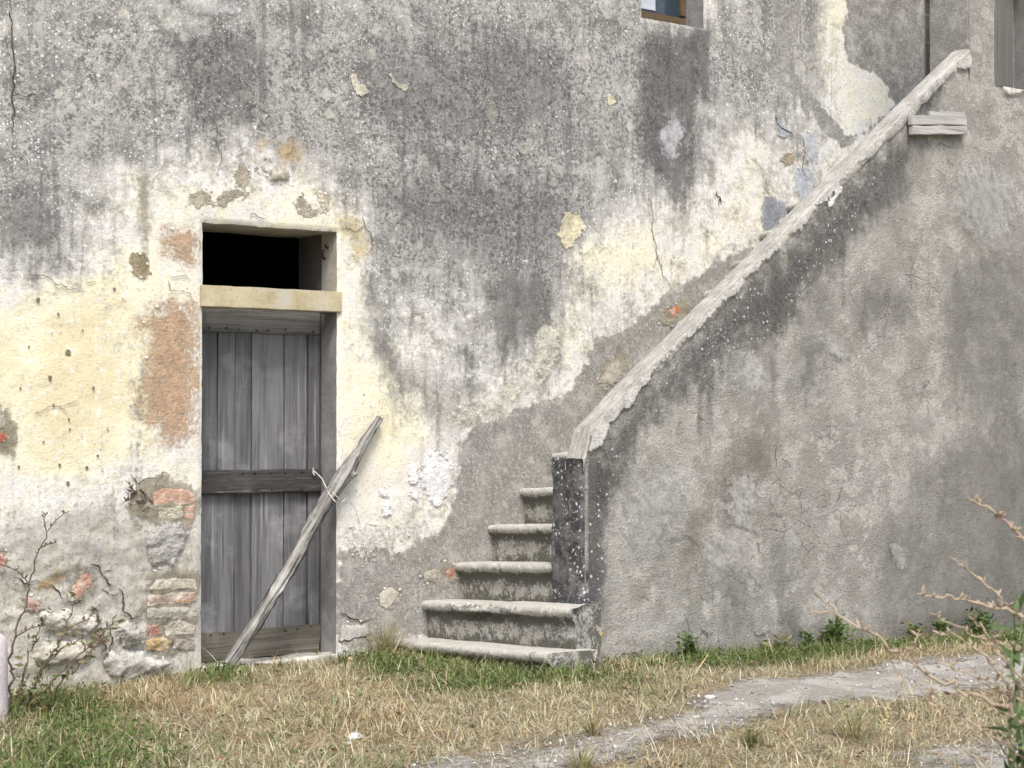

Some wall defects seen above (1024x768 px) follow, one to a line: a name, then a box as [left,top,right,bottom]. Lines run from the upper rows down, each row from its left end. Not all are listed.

crack [9,0,49,150]
damp [347,26,571,151]
flaking render [188,158,272,209]
damp [659,114,684,165]
flaking render [129,252,152,279]
crack [650,200,671,288]
flaking render [588,54,972,451]
flaking render [0,404,20,468]
flaking render [126,470,201,531]
crack [728,446,795,594]
crack [13,564,139,677]
flaking render [139,564,200,659]